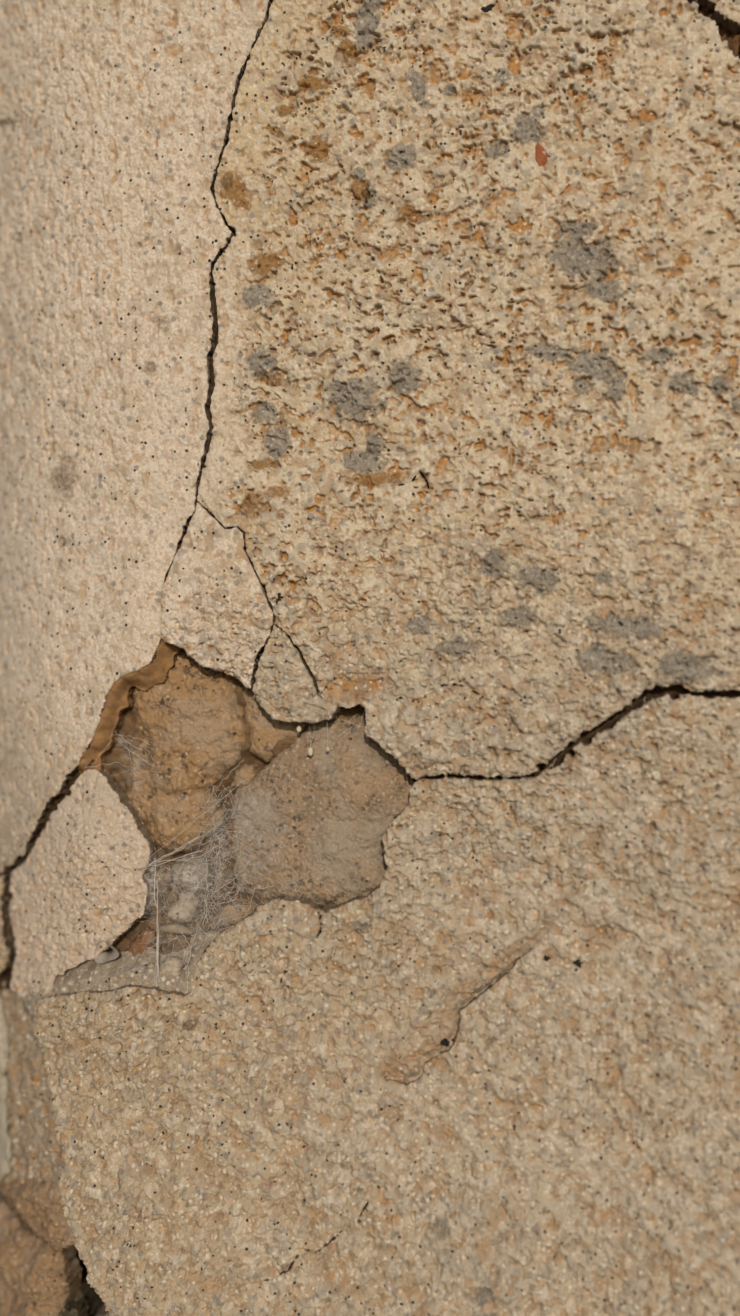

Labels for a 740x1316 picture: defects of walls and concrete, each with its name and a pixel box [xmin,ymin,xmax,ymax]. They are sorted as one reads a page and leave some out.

crack [698,5,740,59]
crack [178,194,317,684]
spalling [318,673,389,721]
crack [412,684,740,784]
crack [0,758,94,990]
peeling [0,503,315,1234]
spalling [59,1298,89,1316]